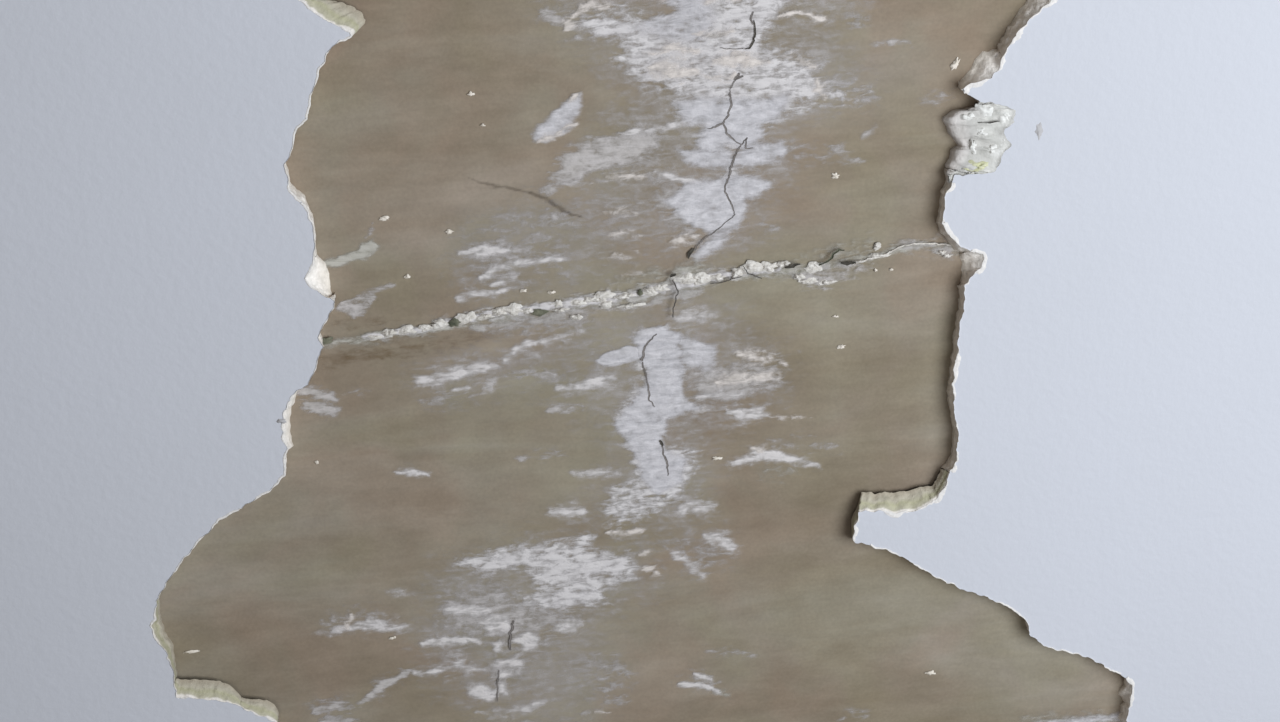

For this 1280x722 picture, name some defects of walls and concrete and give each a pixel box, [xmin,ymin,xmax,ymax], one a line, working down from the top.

leakage [537,0,873,261]
crack [322,11,956,407]
efflorescence [456,233,583,302]
leakage [296,386,338,401]
flaking render [150,0,1135,722]
crack [659,440,669,475]
efflorescence [731,440,819,467]
efflorescence [413,309,798,714]
efflorescence [327,614,408,633]
crack [496,621,514,701]
leakage [312,701,356,722]